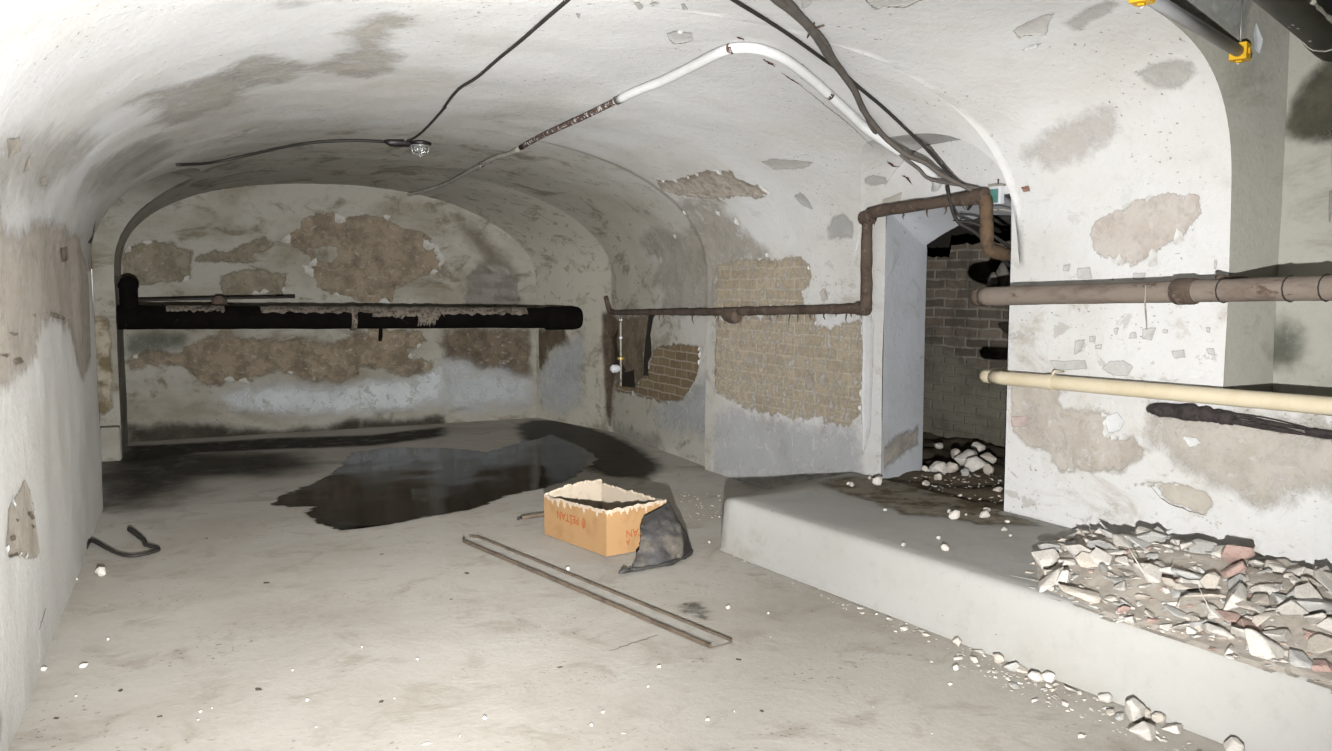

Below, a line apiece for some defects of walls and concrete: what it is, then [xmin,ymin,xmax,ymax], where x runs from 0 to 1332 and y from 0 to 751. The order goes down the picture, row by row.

peeling [866,0,922,11]
water stain [1286,62,1332,140]
peeling [763,159,811,169]
peeling [865,175,902,204]
flaking render [1063,193,1201,279]
flaking render [0,212,444,414]
flaking render [613,168,874,453]
peeling [1050,336,1133,376]
peeling [1114,328,1168,340]
spalling [884,427,918,468]
flaking render [1011,386,1332,515]
spalling [6,480,40,560]